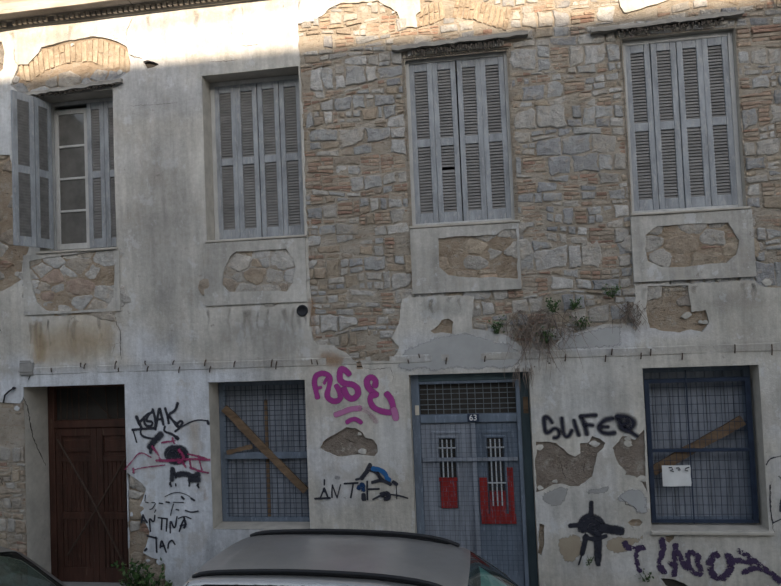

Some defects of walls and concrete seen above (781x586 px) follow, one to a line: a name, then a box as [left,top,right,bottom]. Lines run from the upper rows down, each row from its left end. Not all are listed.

spalling [11,37,131,94]
spalling [298,0,781,369]
spalling [0,155,131,322]
spalling [223,249,296,292]
spalling [0,399,27,563]
crack [23,398,46,465]
spalling [321,427,378,456]
spalling [535,430,647,506]
spalling [129,474,166,586]